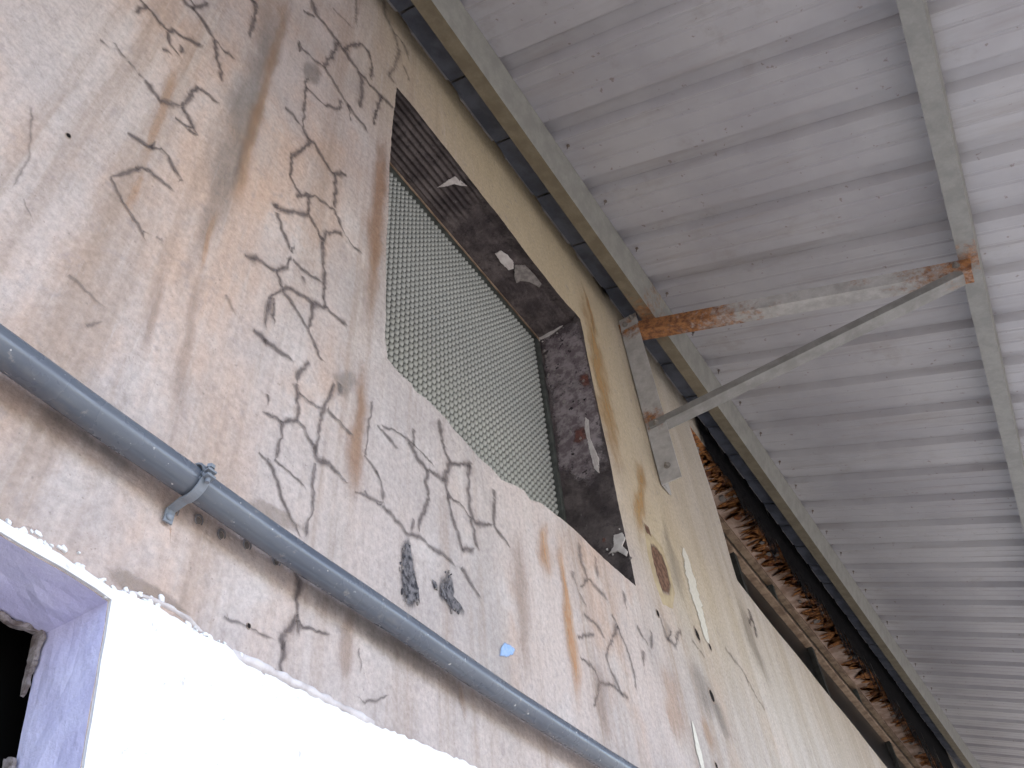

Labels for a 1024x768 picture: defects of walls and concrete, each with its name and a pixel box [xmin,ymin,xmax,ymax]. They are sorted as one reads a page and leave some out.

crack [102,0,233,135]
crack [110,133,183,234]
crack [245,0,509,596]
flaking render [0,611,46,697]
peeling [5,518,85,569]
peeling [98,578,165,608]
crack [227,573,327,671]
rust [562,567,577,675]
crack [573,553,681,705]
flaking render [644,525,675,609]
rust [690,427,943,768]
flaking render [2,757,17,768]